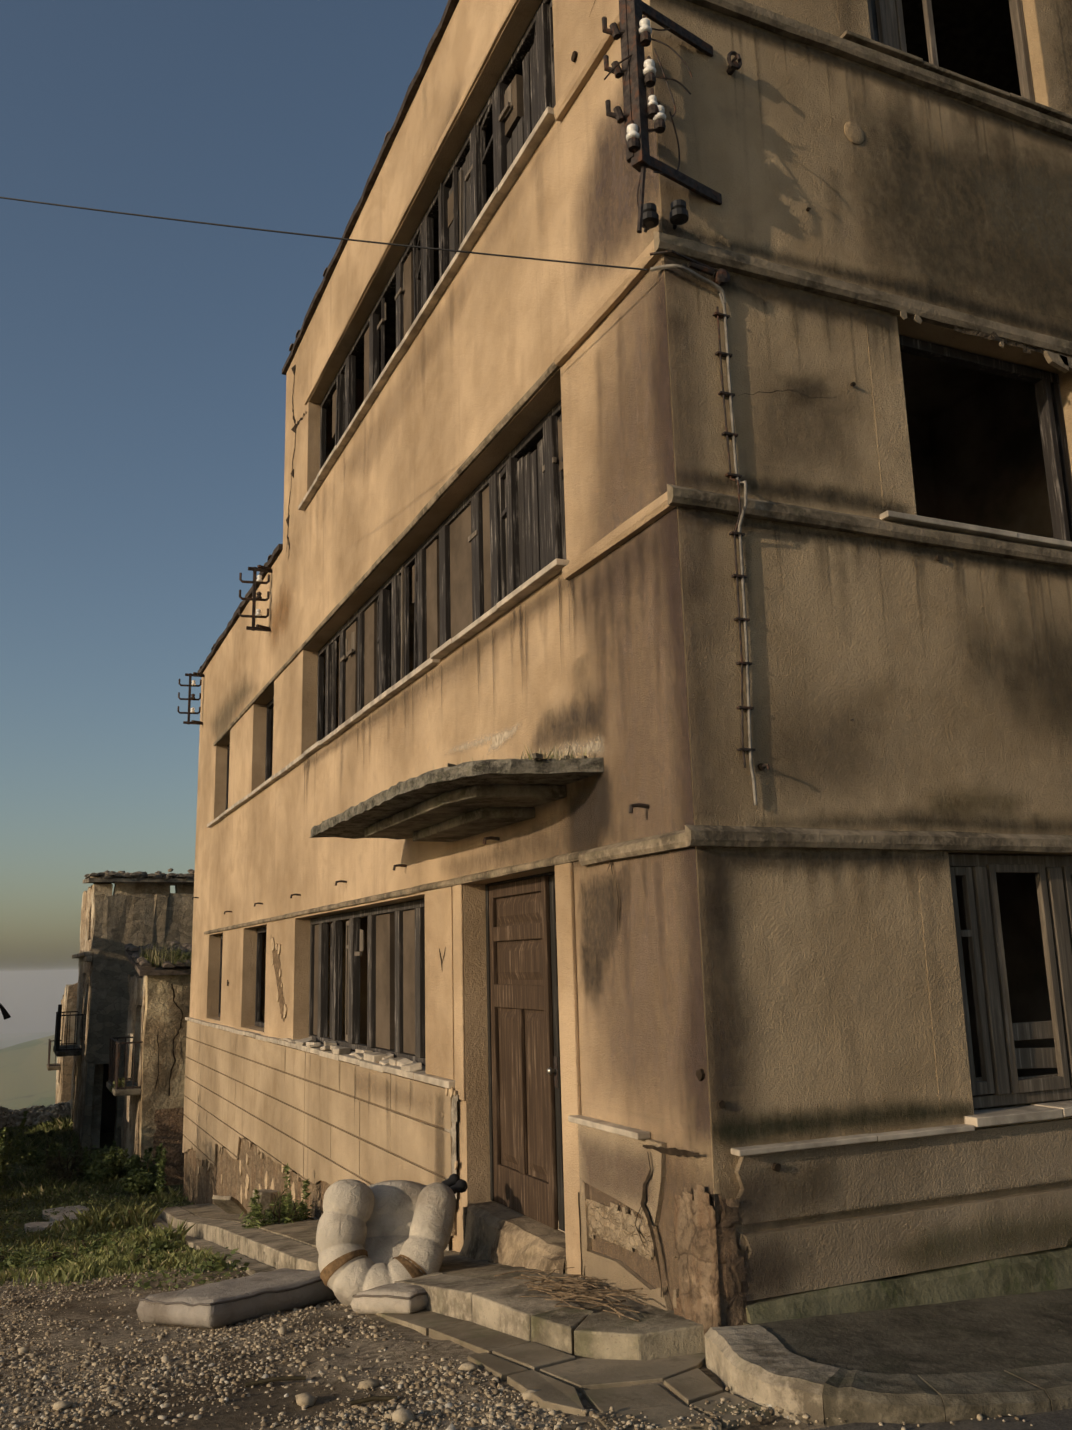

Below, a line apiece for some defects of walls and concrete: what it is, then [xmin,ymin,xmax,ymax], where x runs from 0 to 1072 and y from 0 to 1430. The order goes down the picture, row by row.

leakage [825,121,1072,337]
leakage [582,257,1072,1095]
flaking render [153,1107,331,1219]
flaking render [586,1198,654,1260]
flaking render [673,1185,749,1342]